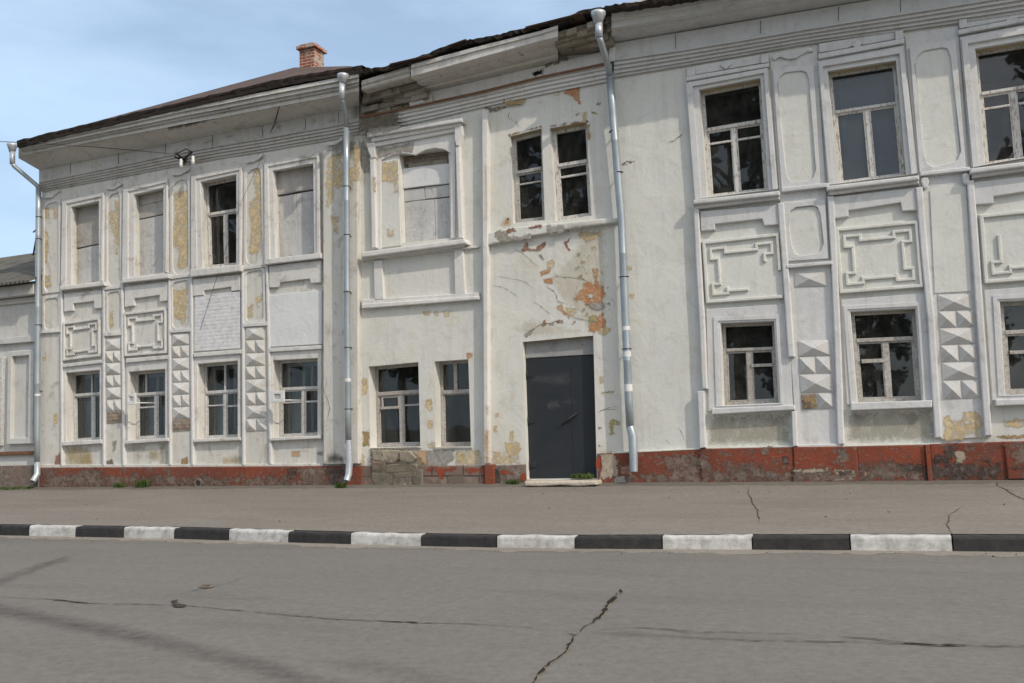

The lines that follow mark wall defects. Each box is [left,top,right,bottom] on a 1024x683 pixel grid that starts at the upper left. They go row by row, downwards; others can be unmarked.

spalling [485,98,525,113]
peeling [508,87,601,140]
peeling [173,190,188,269]
peeling [248,169,262,256]
peeling [325,141,414,235]
peeling [173,288,188,323]
peeling [495,224,611,335]
crack [498,248,614,338]
flaking render [359,431,527,484]
peeling [596,411,1024,483]